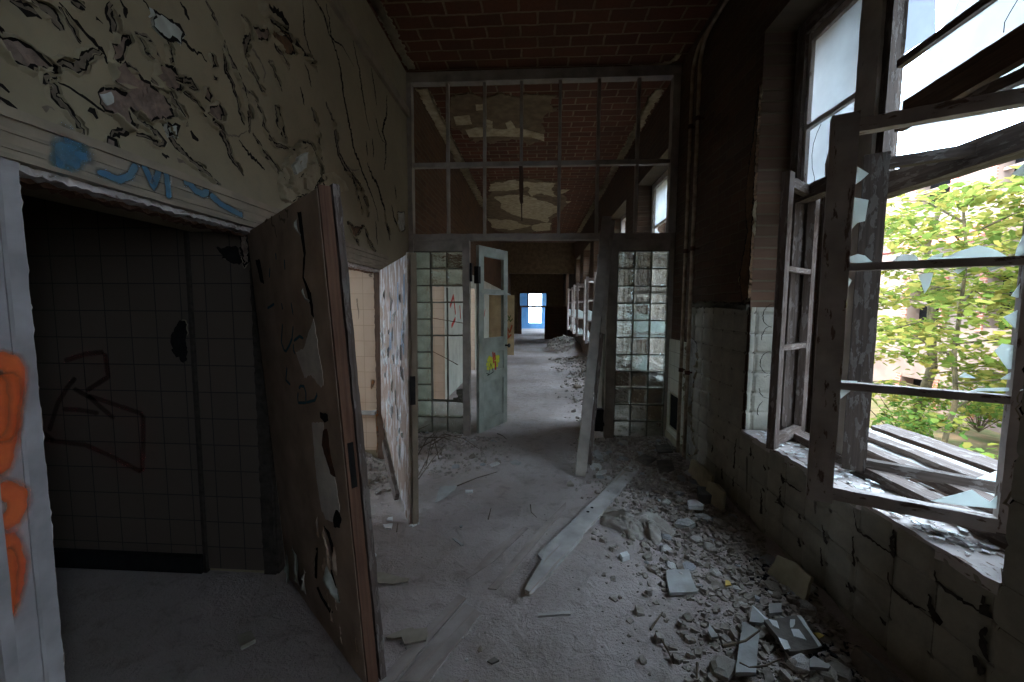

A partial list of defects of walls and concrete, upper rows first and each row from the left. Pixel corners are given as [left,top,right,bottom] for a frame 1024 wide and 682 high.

spalling [0,0,377,252]
crack [269,4,400,245]
crack [711,429,994,676]